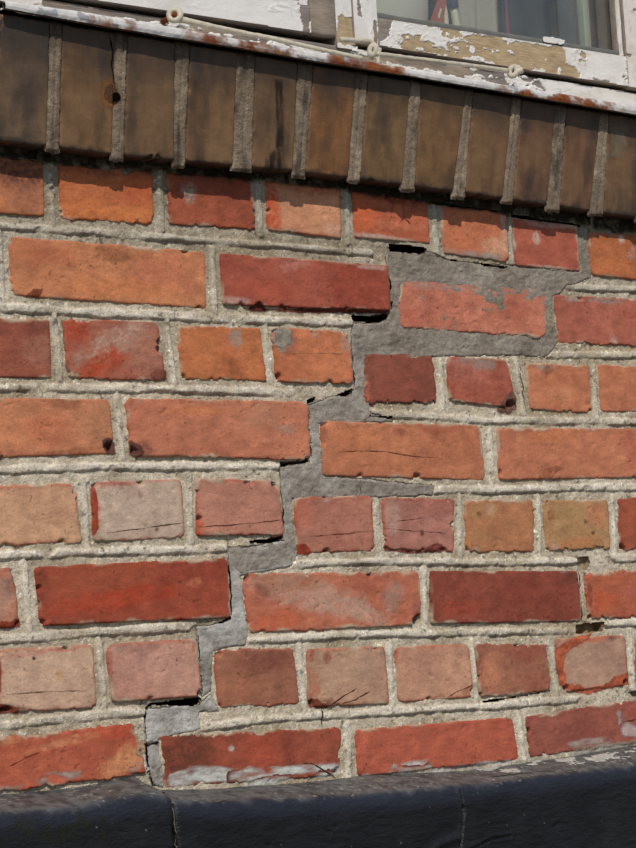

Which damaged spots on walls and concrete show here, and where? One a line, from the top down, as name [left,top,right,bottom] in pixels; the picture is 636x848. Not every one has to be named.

peeling [336,15,357,46]
peeling [398,26,586,79]
crack [450,259,508,269]
crack [317,244,427,397]
crack [205,397,315,546]
crack [144,549,232,848]
crack [321,688,369,727]